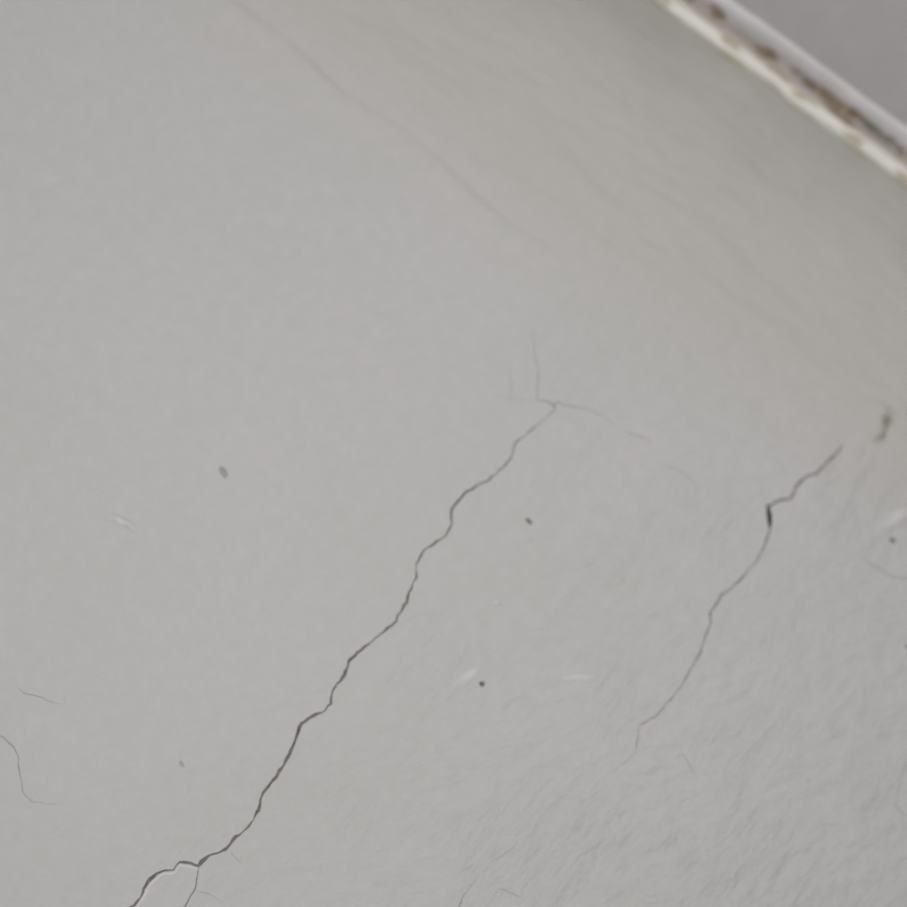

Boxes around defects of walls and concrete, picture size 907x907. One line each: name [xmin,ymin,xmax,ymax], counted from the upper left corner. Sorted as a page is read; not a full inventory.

rust [820,89,859,126]
crack [129,327,699,907]
crack [620,444,846,766]